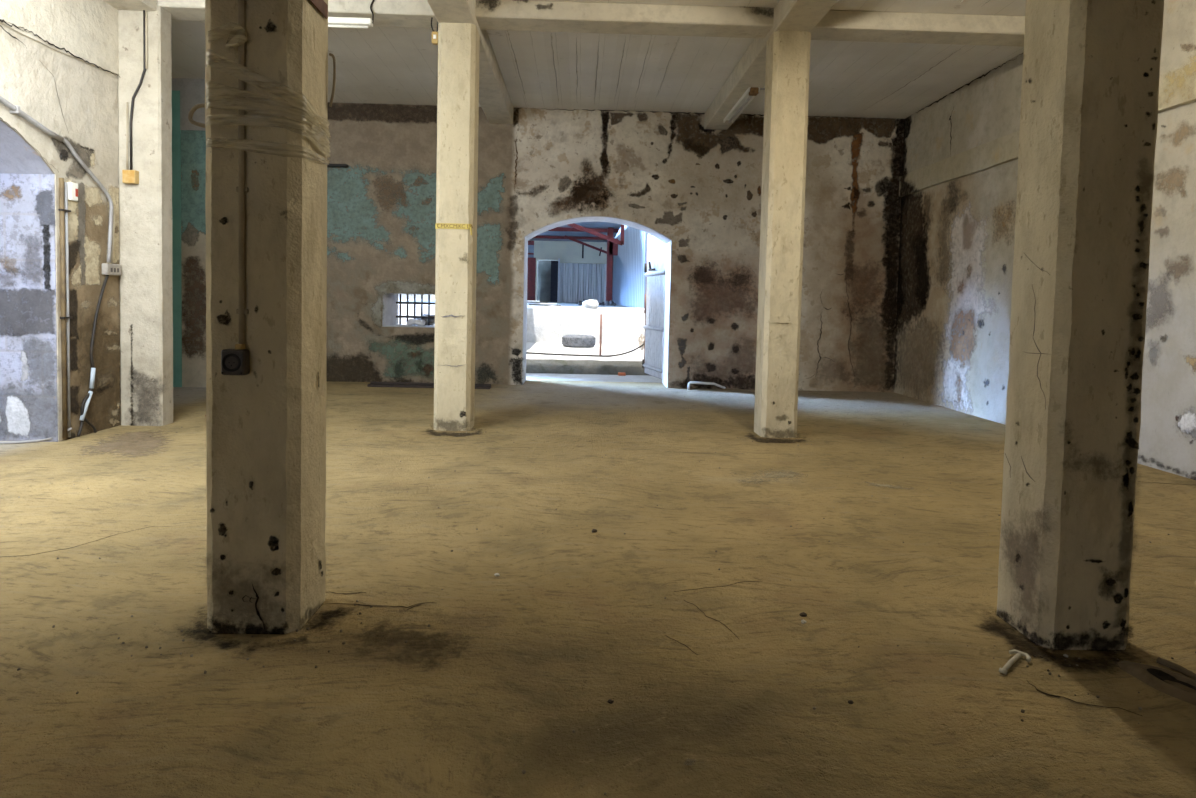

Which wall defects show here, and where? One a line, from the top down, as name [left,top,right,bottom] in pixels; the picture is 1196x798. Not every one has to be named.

crack [0,19,119,130]
peeling [327,164,436,263]
peeling [460,173,506,285]
leakage [519,160,613,213]
leakage [611,112,764,164]
leakage [691,265,758,323]
leakage [807,116,1011,413]
spalling [437,411,469,431]